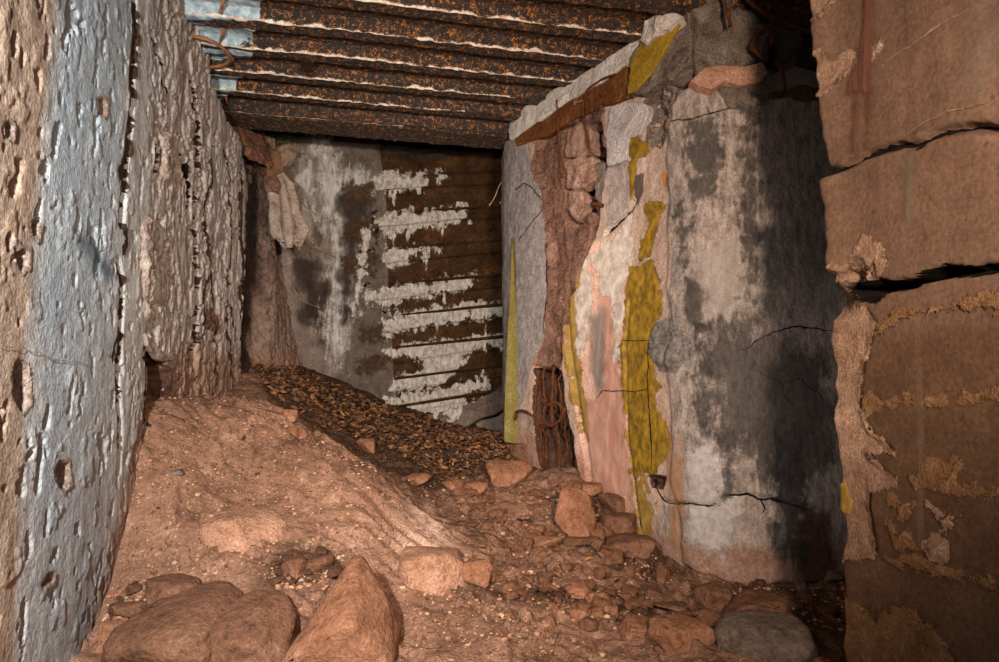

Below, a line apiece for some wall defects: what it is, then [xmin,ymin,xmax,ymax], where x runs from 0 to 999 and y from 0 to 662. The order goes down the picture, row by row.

peeling [182,0,262,60]
peeling [210,74,242,110]
corrosion [299,56,317,82]
damp [291,134,503,422]
spalling [530,124,589,472]
crack [579,340,814,527]
damp [672,200,738,501]
damp [734,105,764,283]
damp [753,418,812,567]
spalling [831,288,999,593]
crack [838,126,999,173]
crack [846,263,999,303]